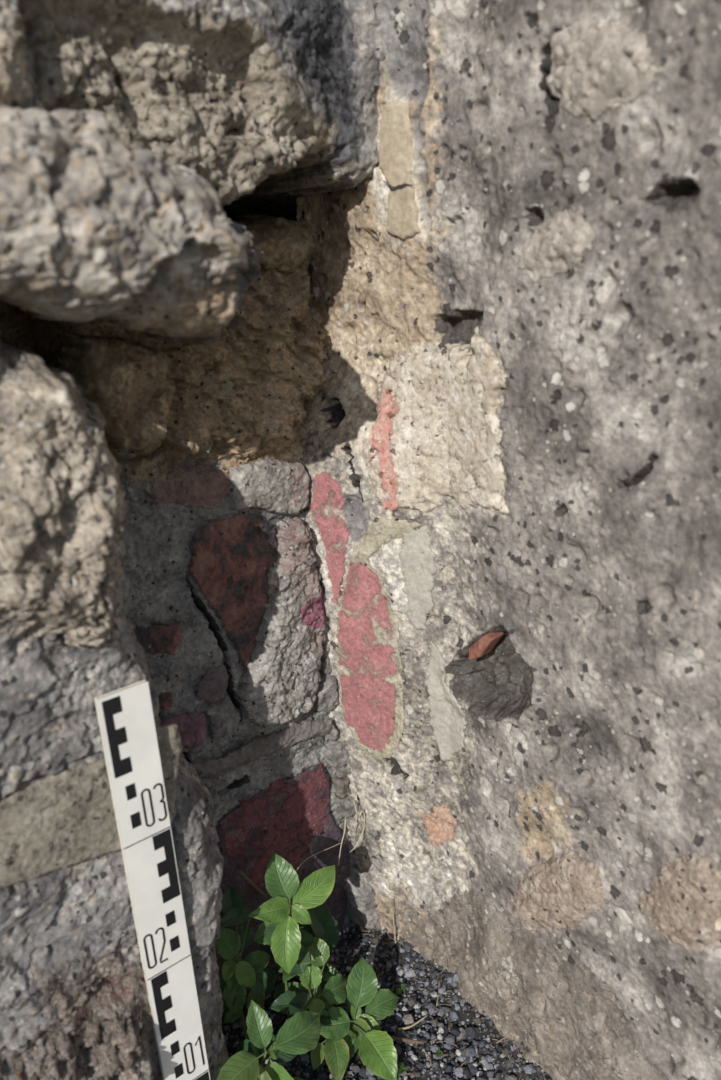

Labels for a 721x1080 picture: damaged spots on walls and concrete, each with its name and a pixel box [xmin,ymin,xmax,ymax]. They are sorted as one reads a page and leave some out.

spalling [321,394,346,431]
peeling [334,326,537,761]
crack [186,577,241,737]